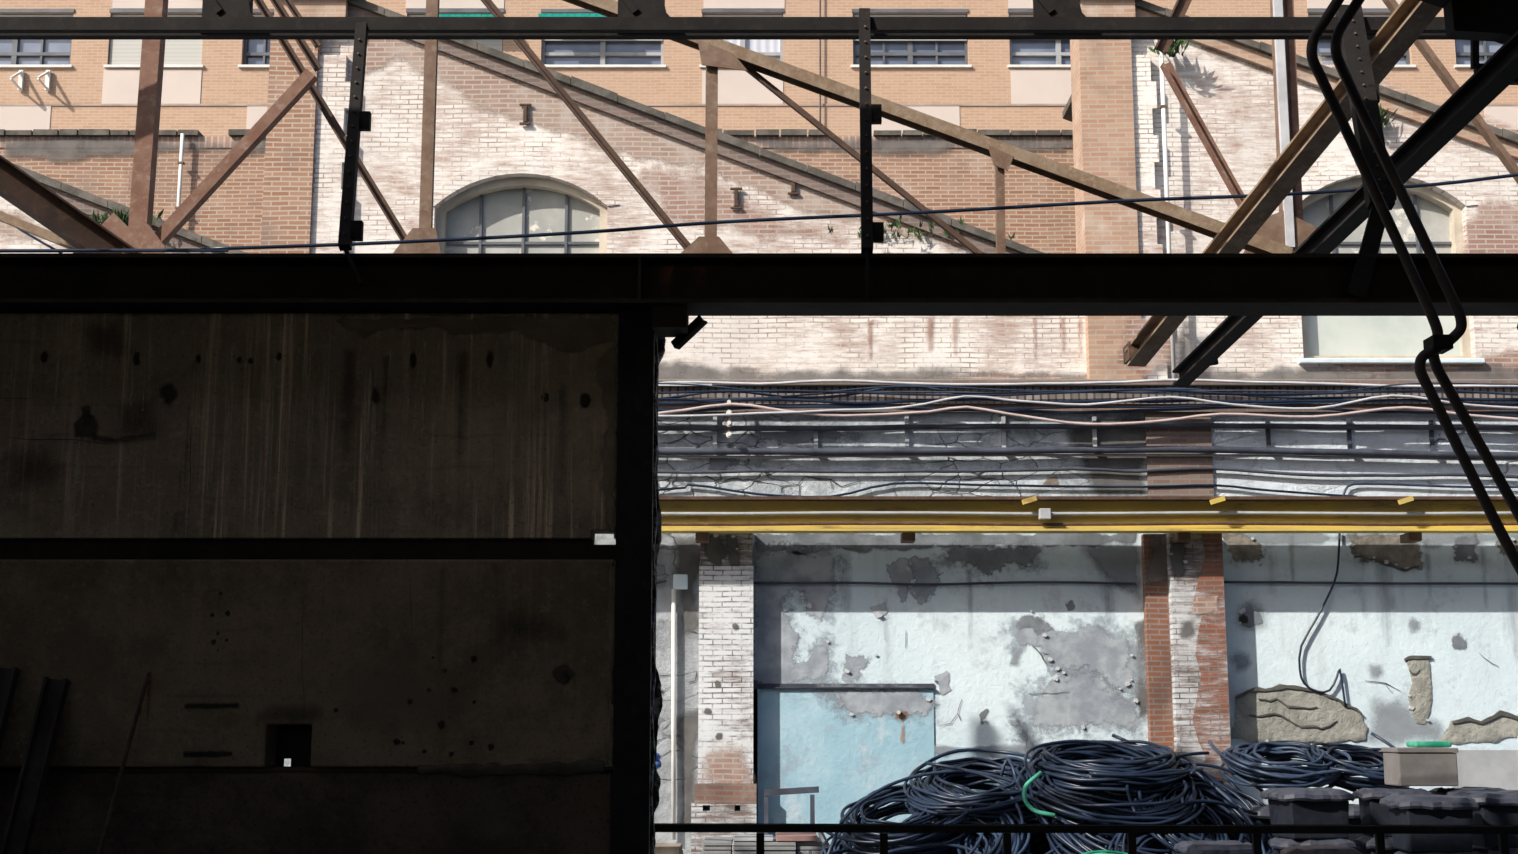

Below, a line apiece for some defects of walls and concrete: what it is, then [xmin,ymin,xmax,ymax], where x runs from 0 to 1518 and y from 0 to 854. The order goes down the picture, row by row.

crack [693,473,861,495]
peeling [870,542,1041,618]
peeling [705,534,951,718]
peeling [1009,600,1147,746]
spalling [1404,655,1518,744]